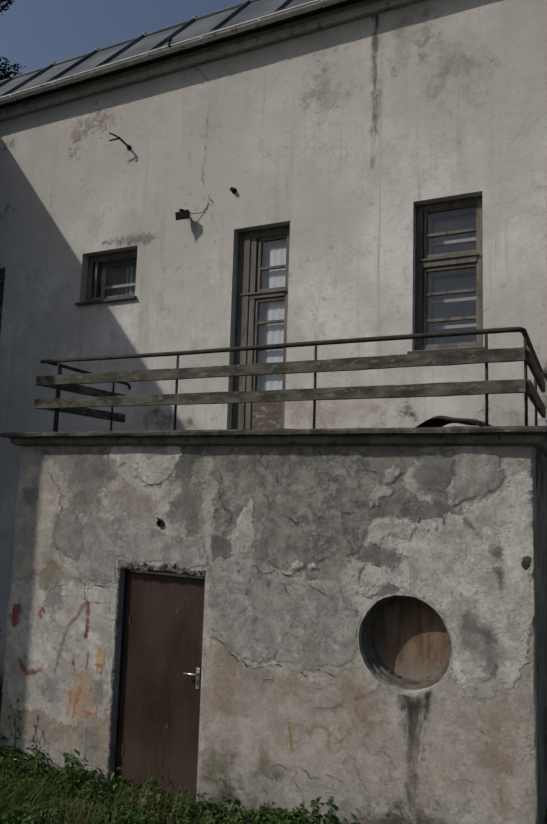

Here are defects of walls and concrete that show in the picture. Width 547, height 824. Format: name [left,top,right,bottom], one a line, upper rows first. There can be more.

flaking render [211,446,419,580]
water stain [535,449,547,586]
crack [211,538,399,796]
water stain [403,692,430,745]
water stain [536,598,547,807]